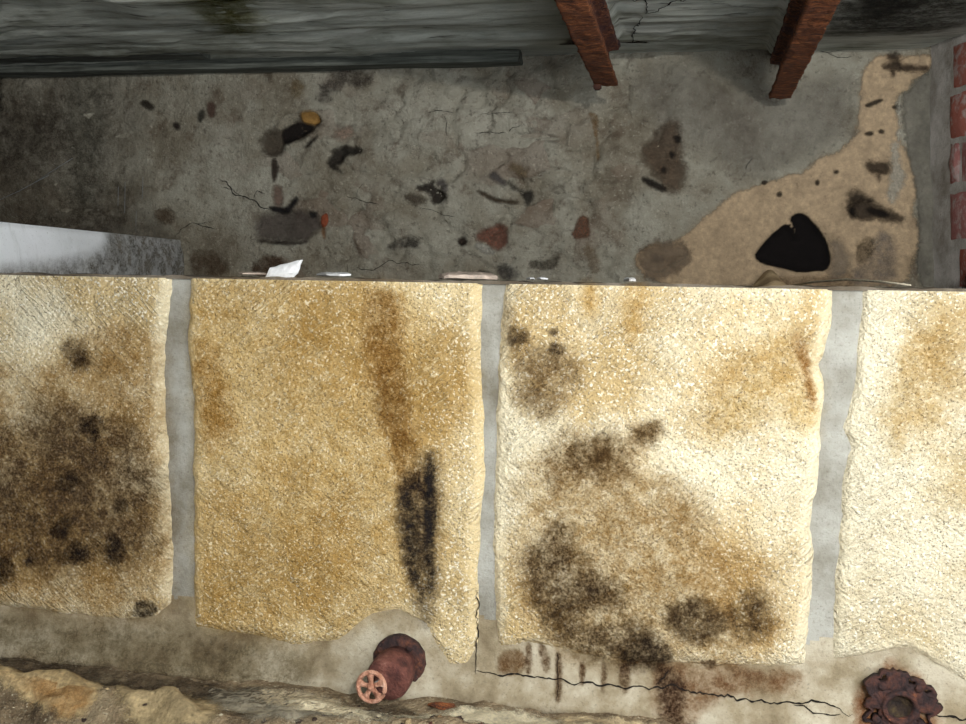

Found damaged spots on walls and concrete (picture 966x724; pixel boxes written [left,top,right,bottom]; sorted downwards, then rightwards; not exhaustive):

crack [631,0,686,43]
flaking render [623,54,932,287]
damp [400,475,434,598]
damp [548,580,612,632]
damp [590,628,684,712]
crack [475,592,851,717]
crack [936,714,966,722]